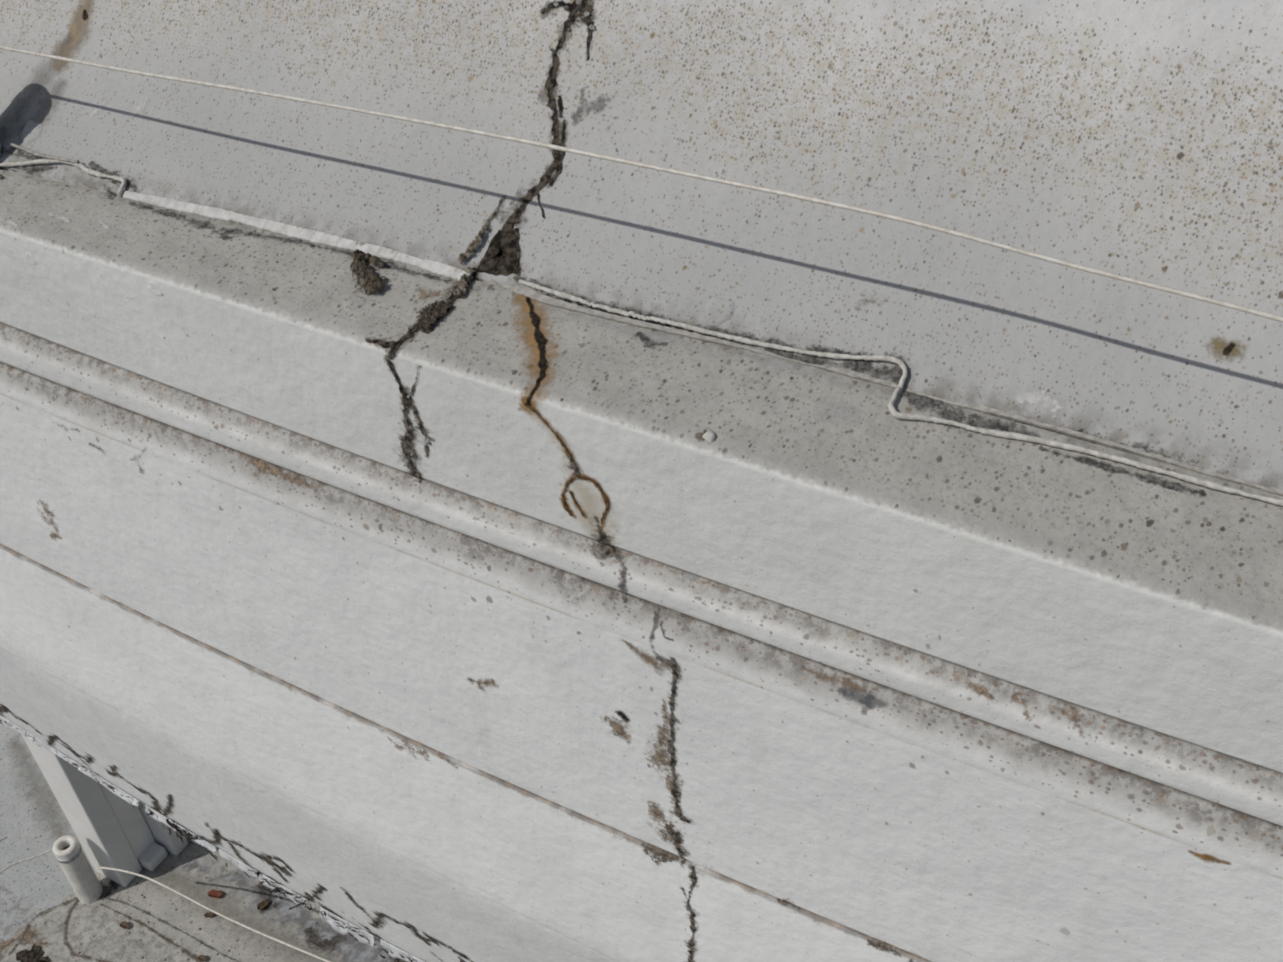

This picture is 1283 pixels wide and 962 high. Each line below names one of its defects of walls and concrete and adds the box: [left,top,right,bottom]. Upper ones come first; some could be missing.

crack [365,0,697,962]
corrosion [514,294,610,531]
peeling [0,715,425,962]